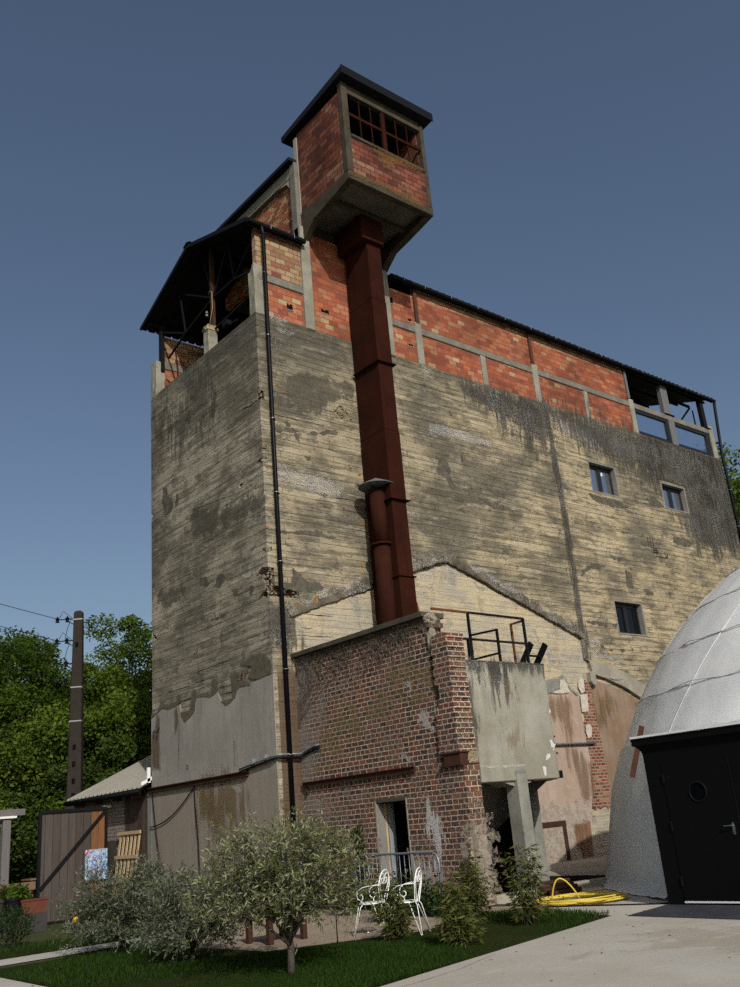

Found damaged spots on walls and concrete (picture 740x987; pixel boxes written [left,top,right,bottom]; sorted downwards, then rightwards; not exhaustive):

peeling [200,567,323,599]
damp [460,377,740,662]
peeling [151,653,281,905]
damp [467,654,544,746]
peeling [538,673,611,863]
spalling [549,875,605,885]